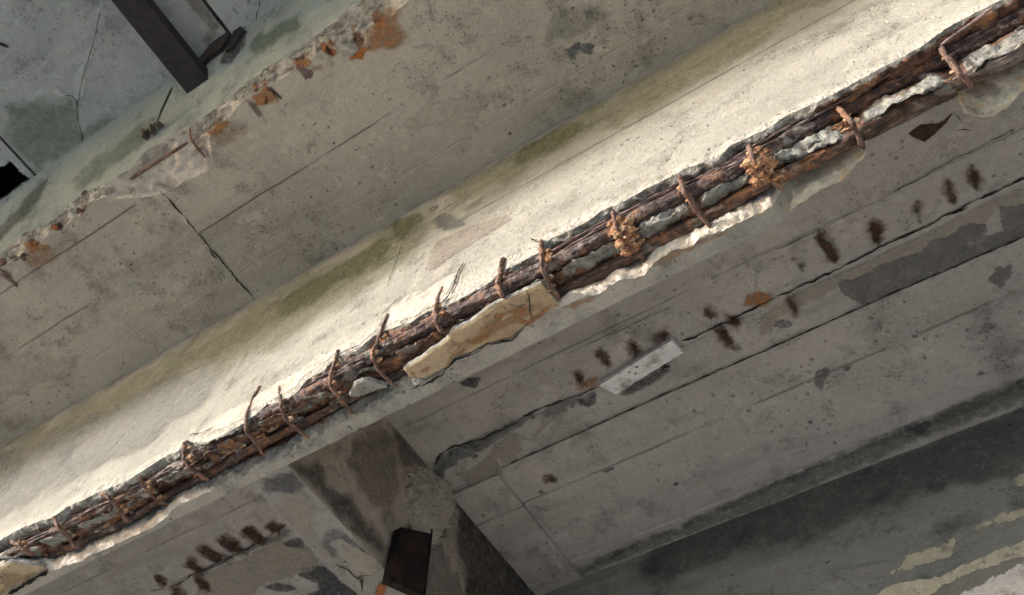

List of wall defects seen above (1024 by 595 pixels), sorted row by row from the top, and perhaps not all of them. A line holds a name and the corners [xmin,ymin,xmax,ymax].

spalling [0,0,409,267]
rust [740,146,790,188]
spalling [543,0,1024,289]
crack [161,192,255,300]
rust [607,215,645,257]
leakage [838,204,1024,305]
spalling [0,183,781,595]
crack [408,387,597,477]
rust [704,309,740,349]
crack [503,236,1024,468]
leakage [815,367,830,390]
rust [185,523,284,592]